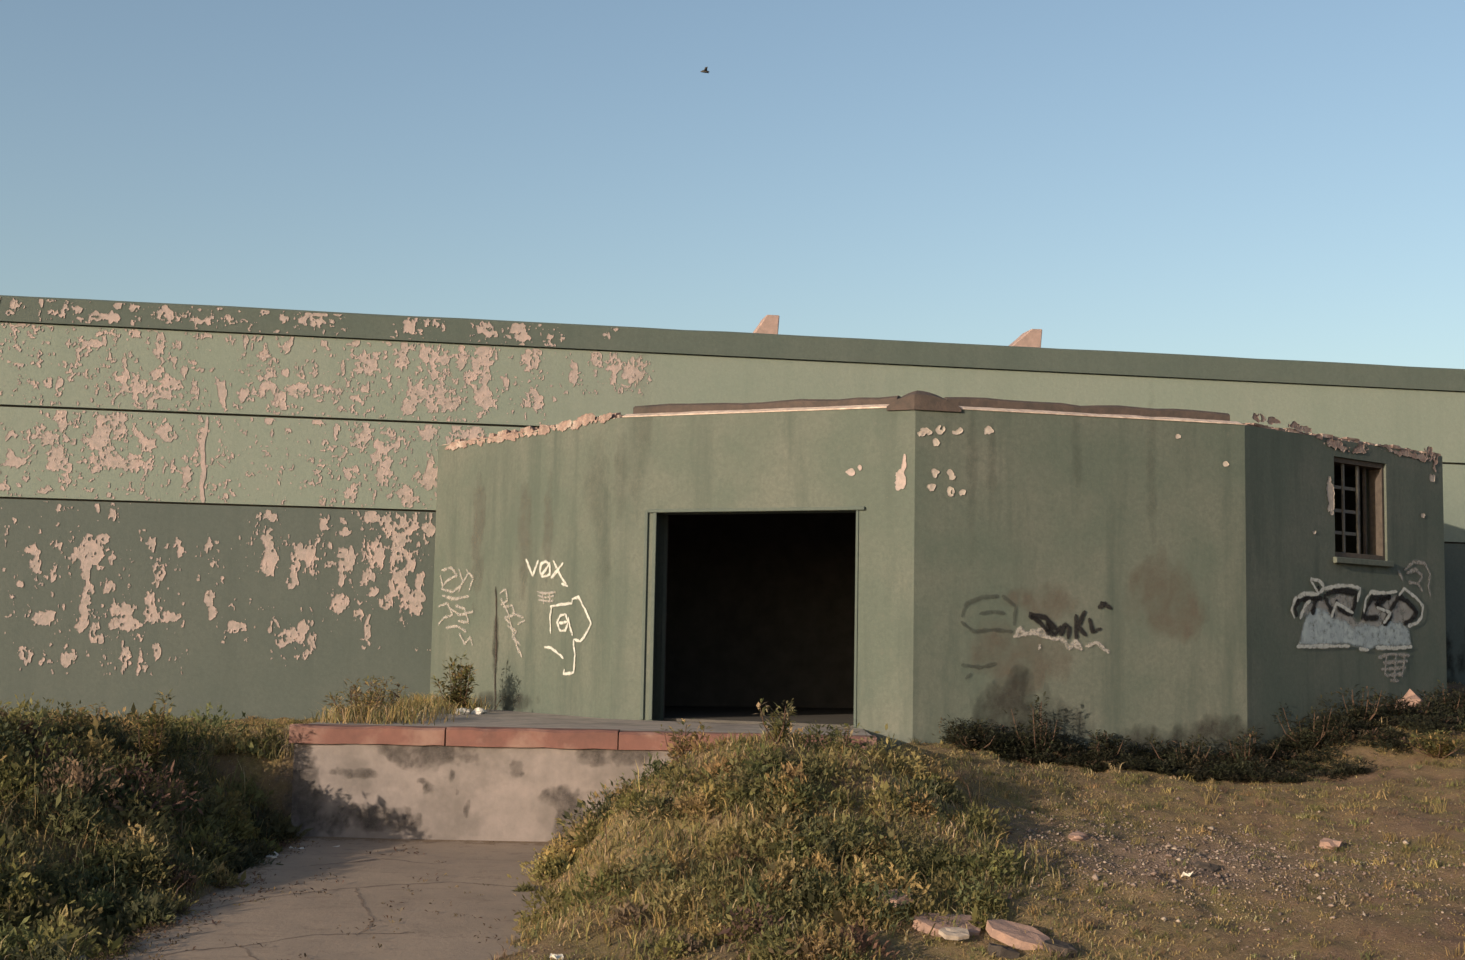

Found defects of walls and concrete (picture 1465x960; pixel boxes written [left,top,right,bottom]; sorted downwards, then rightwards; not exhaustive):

peeling [917,425,963,446]
spalling [1242,413,1441,482]
peeling [0,298,654,676]
peeling [895,454,906,491]
peeling [927,468,966,497]
damp [276,747,412,829]
damp [382,744,454,789]